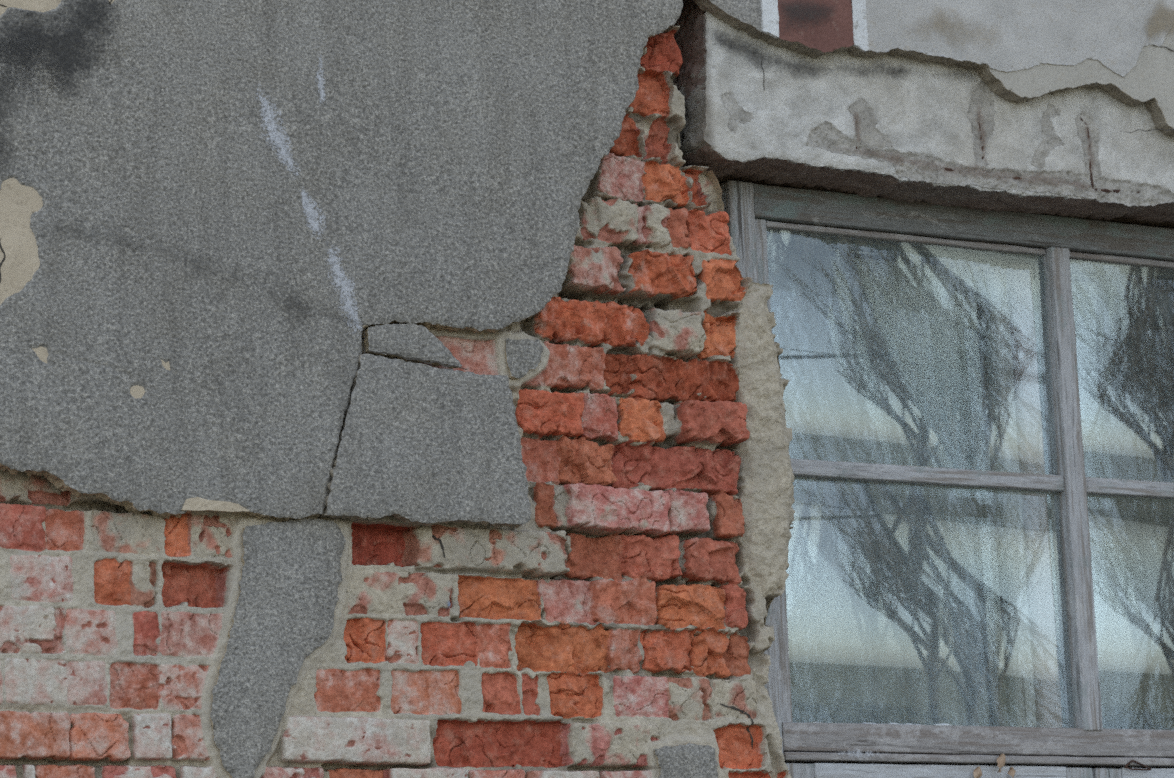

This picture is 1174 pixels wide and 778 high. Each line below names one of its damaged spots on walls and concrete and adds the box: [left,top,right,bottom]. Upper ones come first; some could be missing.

flaking render [0,0,61,16]
water stain [0,0,111,118]
spalling [806,24,1174,207]
crack [0,243,8,282]
flaking render [0,177,43,305]
flaking render [32,347,48,363]
spalling [515,27,754,679]
flaking render [130,385,145,399]
crack [325,323,467,512]
flaking render [181,497,249,512]
spalling [713,722,790,778]